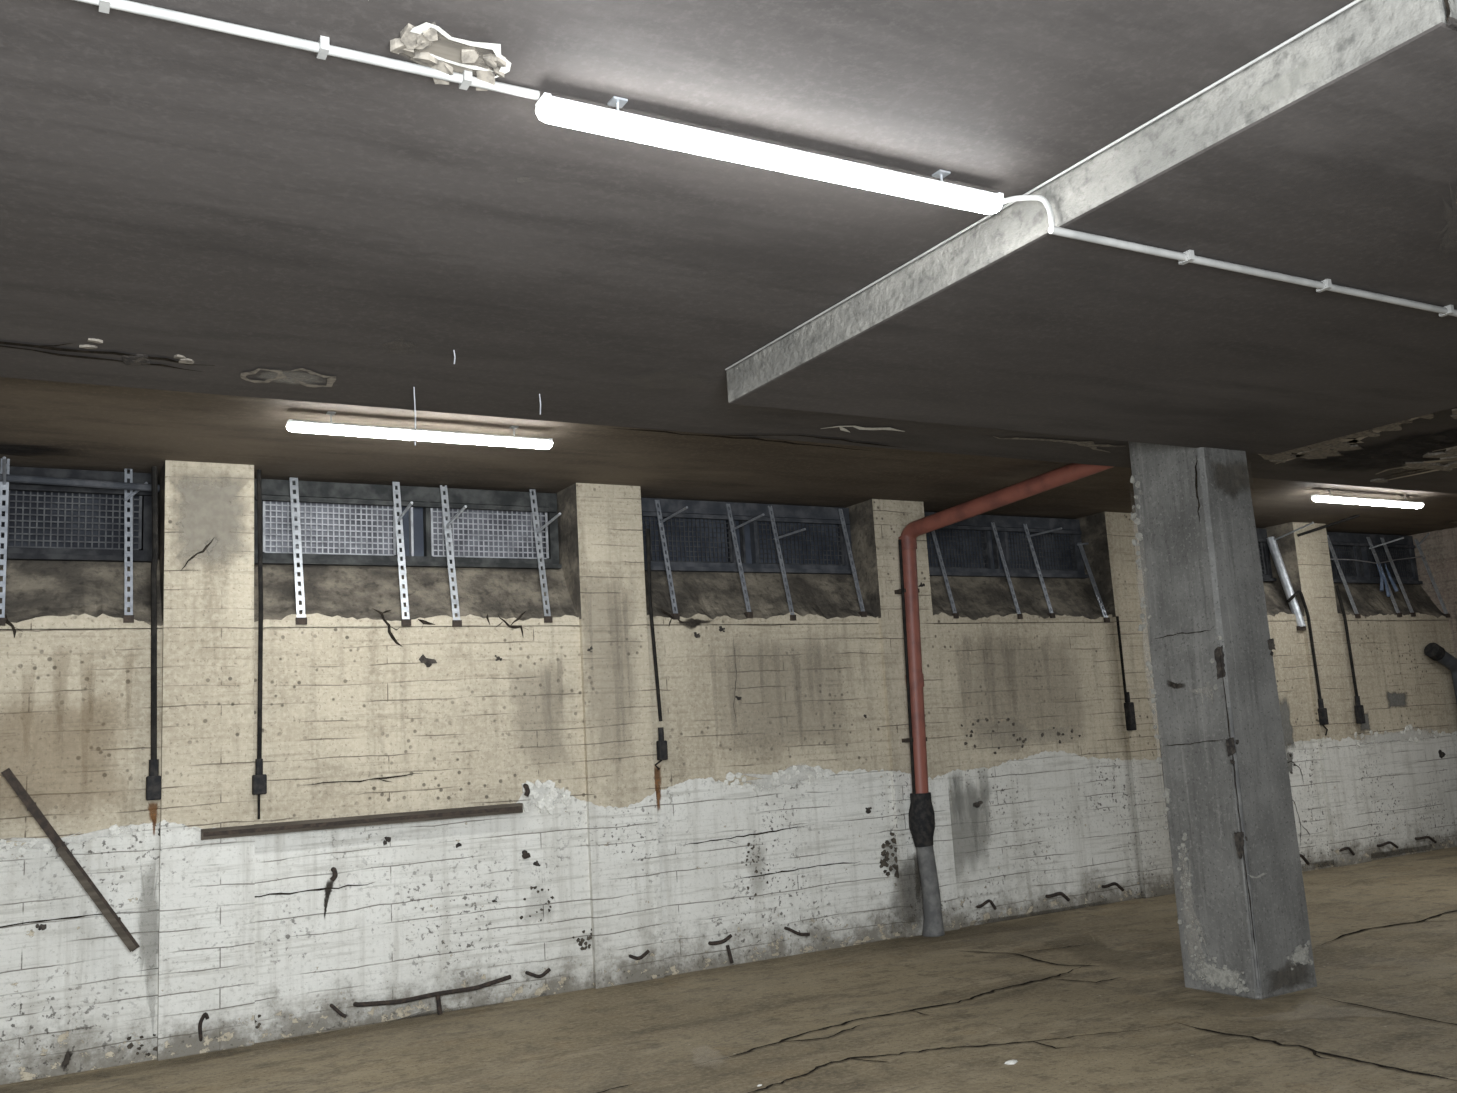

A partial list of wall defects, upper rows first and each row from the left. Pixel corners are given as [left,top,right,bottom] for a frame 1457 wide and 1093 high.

peeling [1258,408,1457,464]
peeling [1370,446,1457,483]
crack [1322,910,1457,945]
crack [683,944,1457,1093]